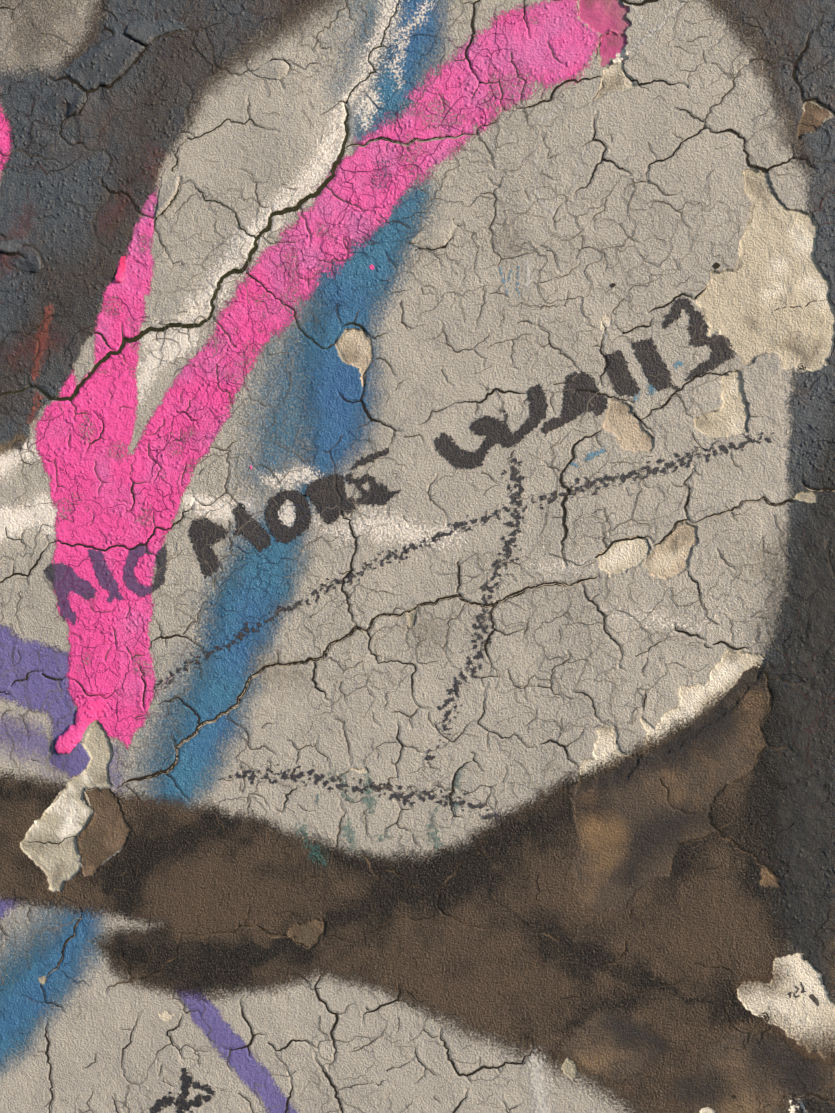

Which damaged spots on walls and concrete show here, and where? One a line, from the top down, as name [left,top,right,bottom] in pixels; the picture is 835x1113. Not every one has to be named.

peeling [335,328,374,387]
spalling [693,169,835,440]
crack [428,455,505,524]
peeling [602,398,654,453]
peeling [597,521,699,580]
spalling [20,699,132,892]
crack [273,787,363,922]
crack [0,878,385,1019]
crack [0,1012,61,1113]
crack [75,969,543,1113]
peeling [553,953,835,1113]
crack [642,1005,835,1113]